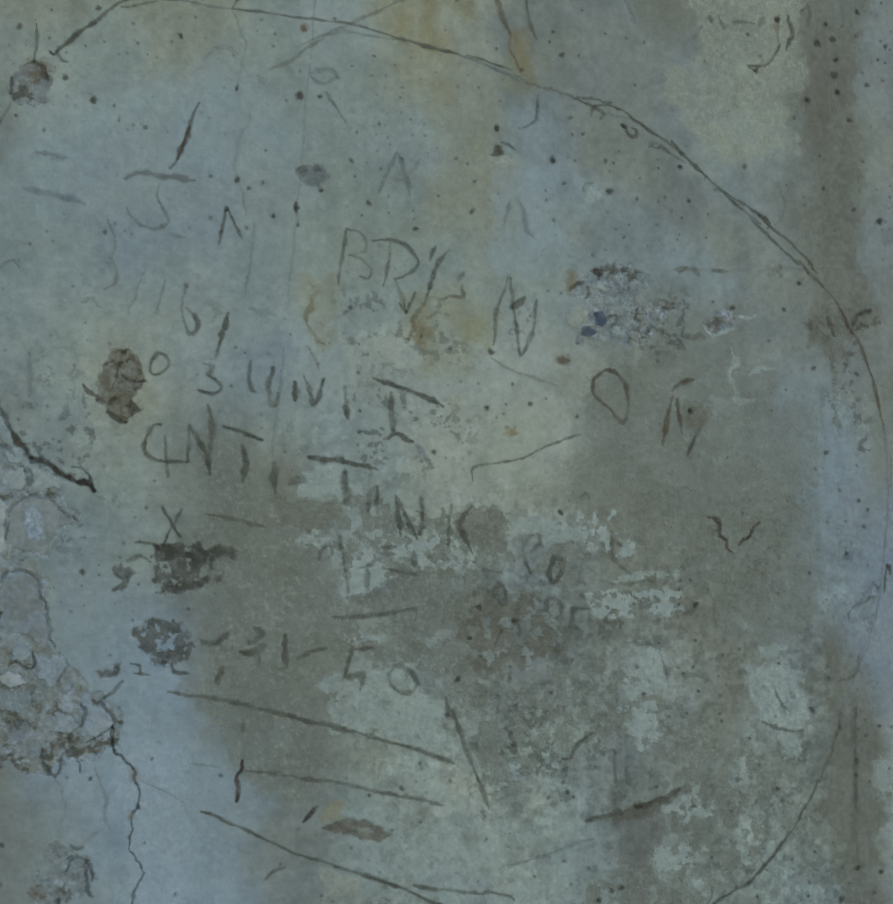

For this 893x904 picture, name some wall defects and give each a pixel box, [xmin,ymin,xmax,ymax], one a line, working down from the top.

spalling [8,62,52,106]
water stain [795,0,873,358]
spalling [567,261,673,345]
spalling [83,349,146,424]
crack [0,408,96,491]
spalling [0,417,123,775]
spalling [112,566,134,591]
spalling [149,542,235,594]
spalling [132,618,191,675]
crack [111,727,142,896]
water stain [826,638,891,904]